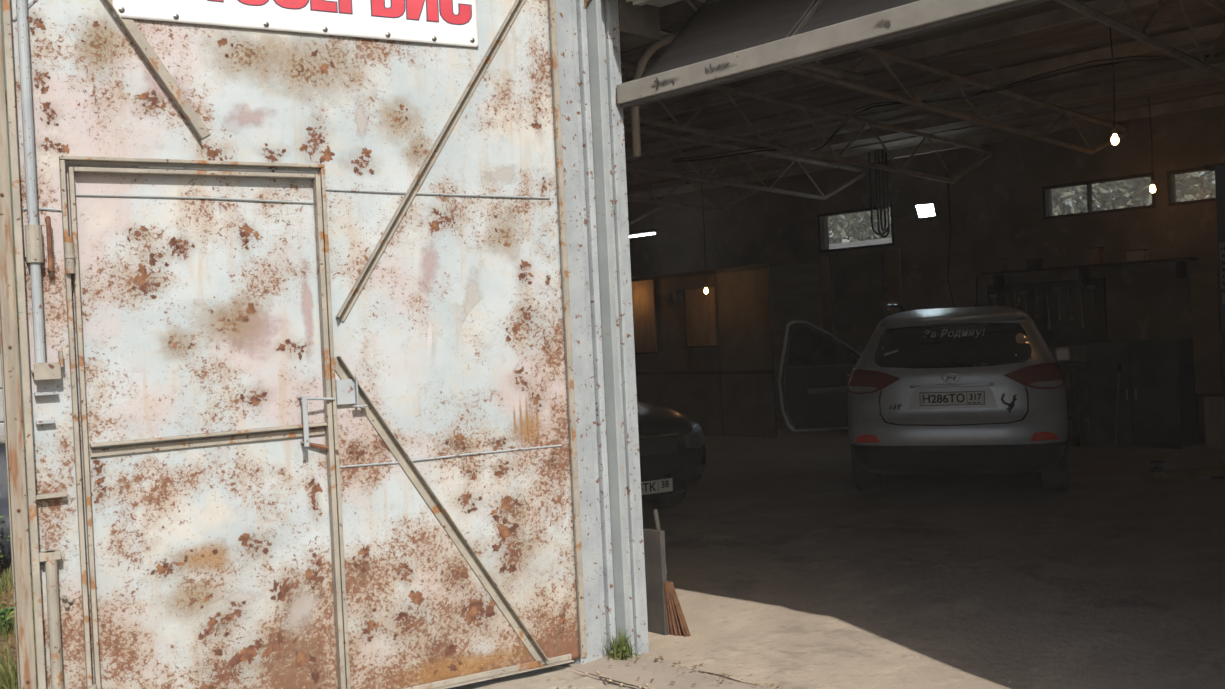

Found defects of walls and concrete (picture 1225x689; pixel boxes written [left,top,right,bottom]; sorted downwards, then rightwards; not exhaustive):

corrosion [184,548,224,565]
corrosion [420,656,508,681]